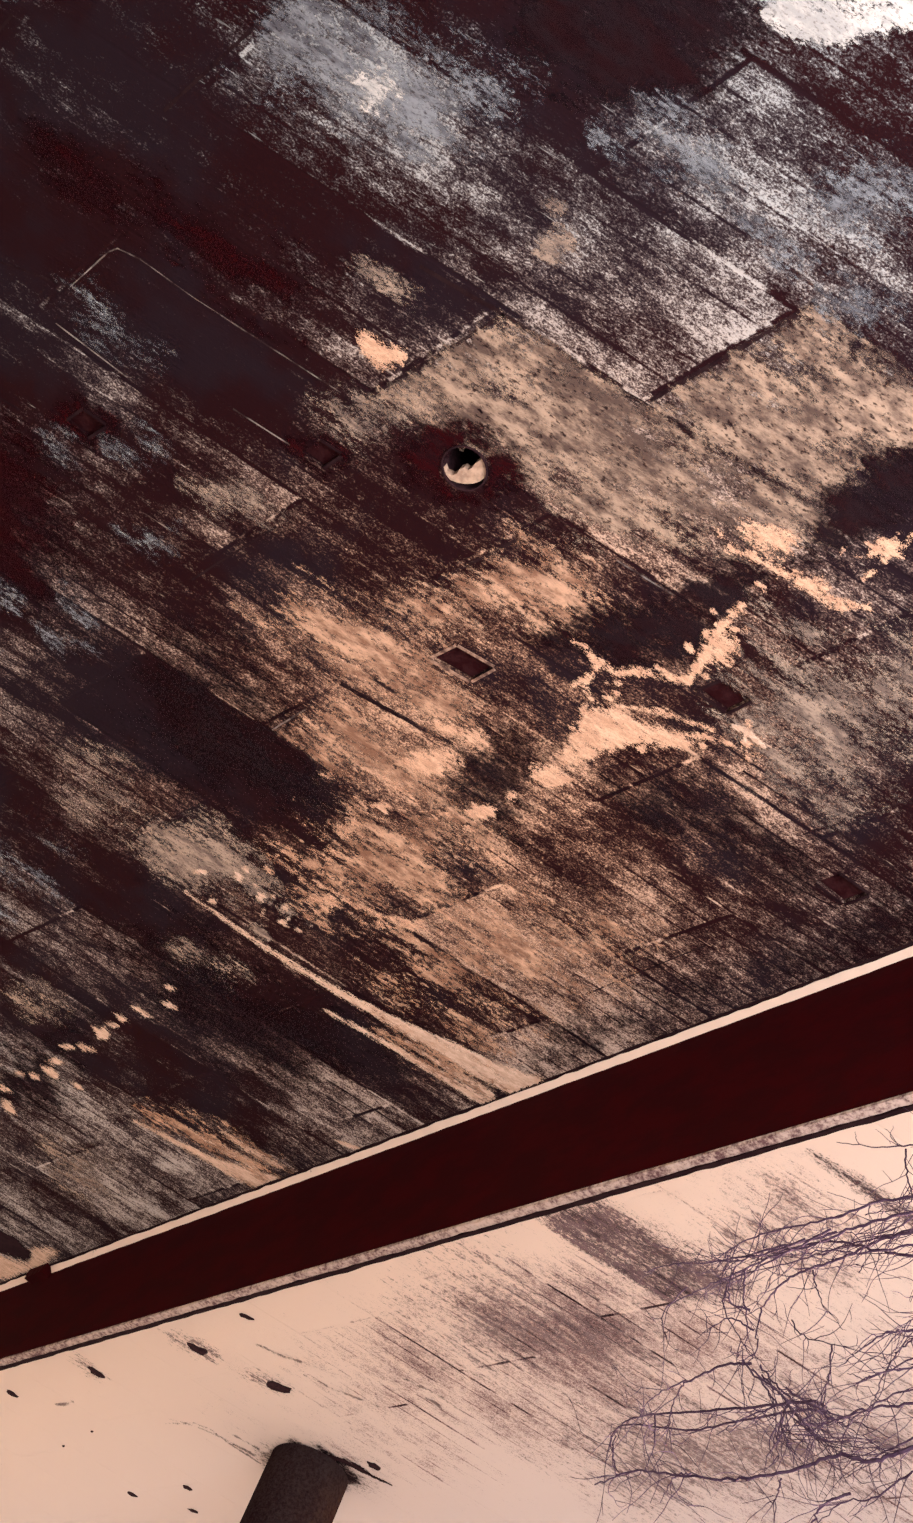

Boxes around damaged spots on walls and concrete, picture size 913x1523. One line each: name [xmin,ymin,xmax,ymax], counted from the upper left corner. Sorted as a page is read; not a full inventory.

leakage [105,612,347,838]
peeling [1,974,75,1026]
peeling [0,984,178,1114]